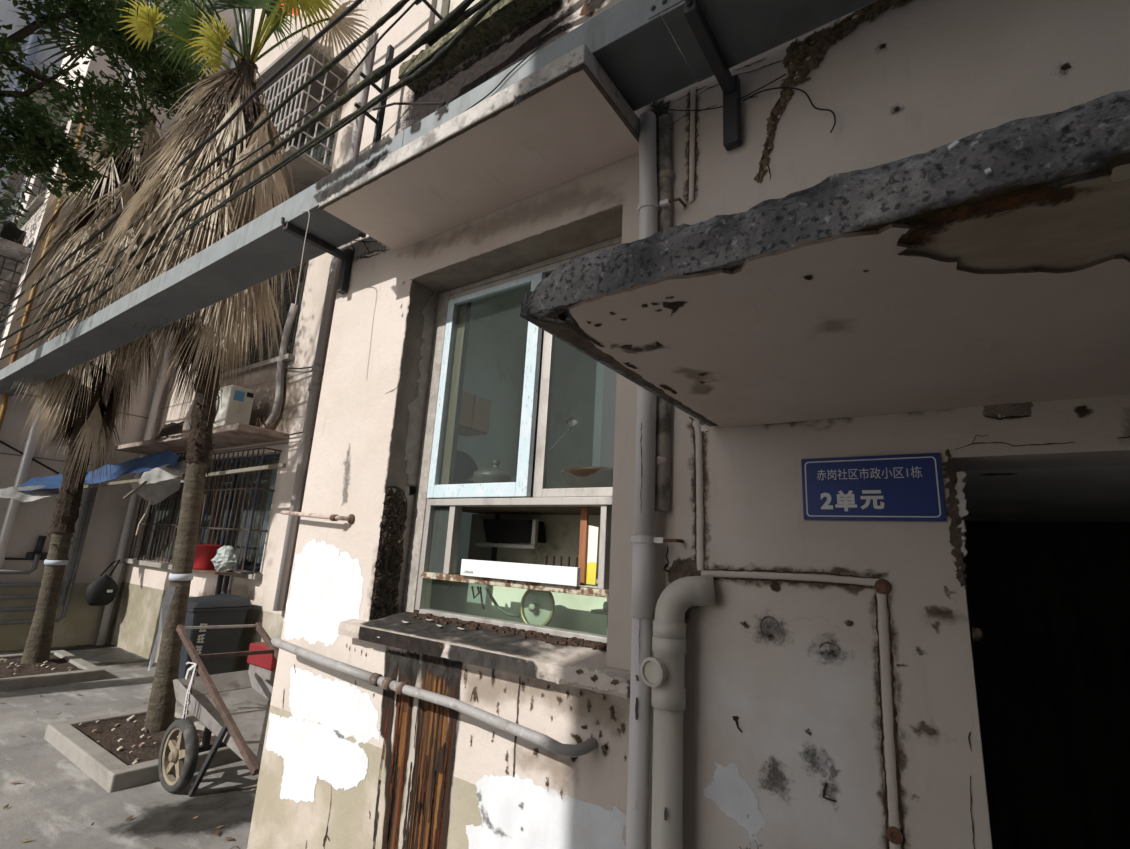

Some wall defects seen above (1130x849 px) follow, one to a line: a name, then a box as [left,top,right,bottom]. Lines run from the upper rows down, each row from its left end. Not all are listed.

flaking render [733,0,912,183]
flaking render [854,150,1130,273]
peeling [642,296,686,316]
spalling [532,310,718,442]
crack [955,435,1074,450]
flaking render [941,449,969,605]
damp [463,669,626,777]